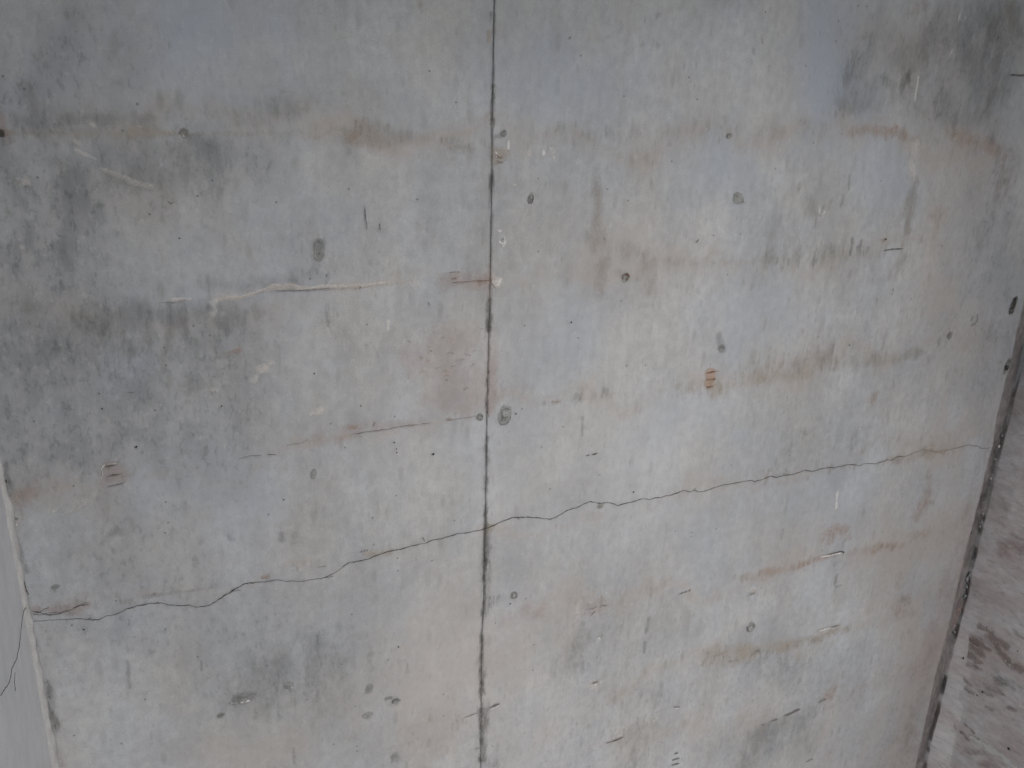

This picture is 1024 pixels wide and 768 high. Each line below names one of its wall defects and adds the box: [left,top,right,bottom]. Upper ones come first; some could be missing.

crack [0,444,984,696]